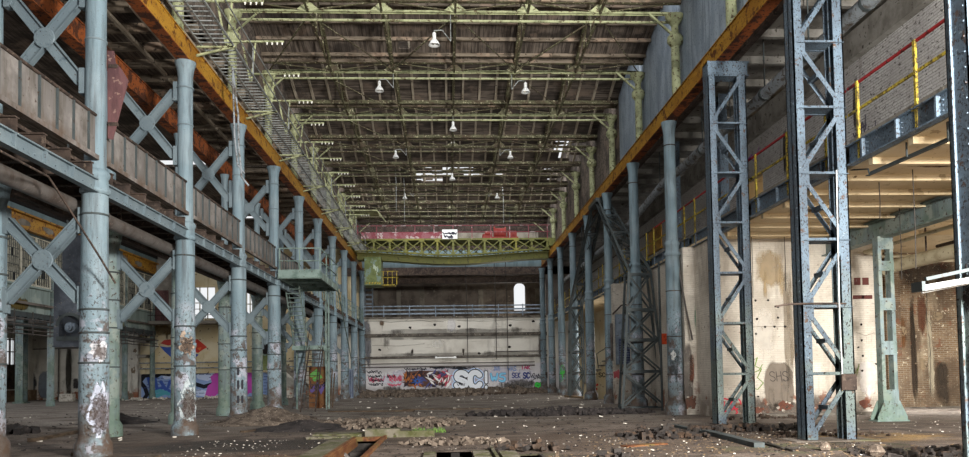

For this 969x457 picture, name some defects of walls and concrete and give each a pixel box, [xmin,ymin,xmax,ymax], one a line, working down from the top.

corrosion [180,337,193,354]
water stain [755,251,797,413]
water stain [910,303,949,402]
peeling [72,378,110,438]
corrosion [182,389,195,419]